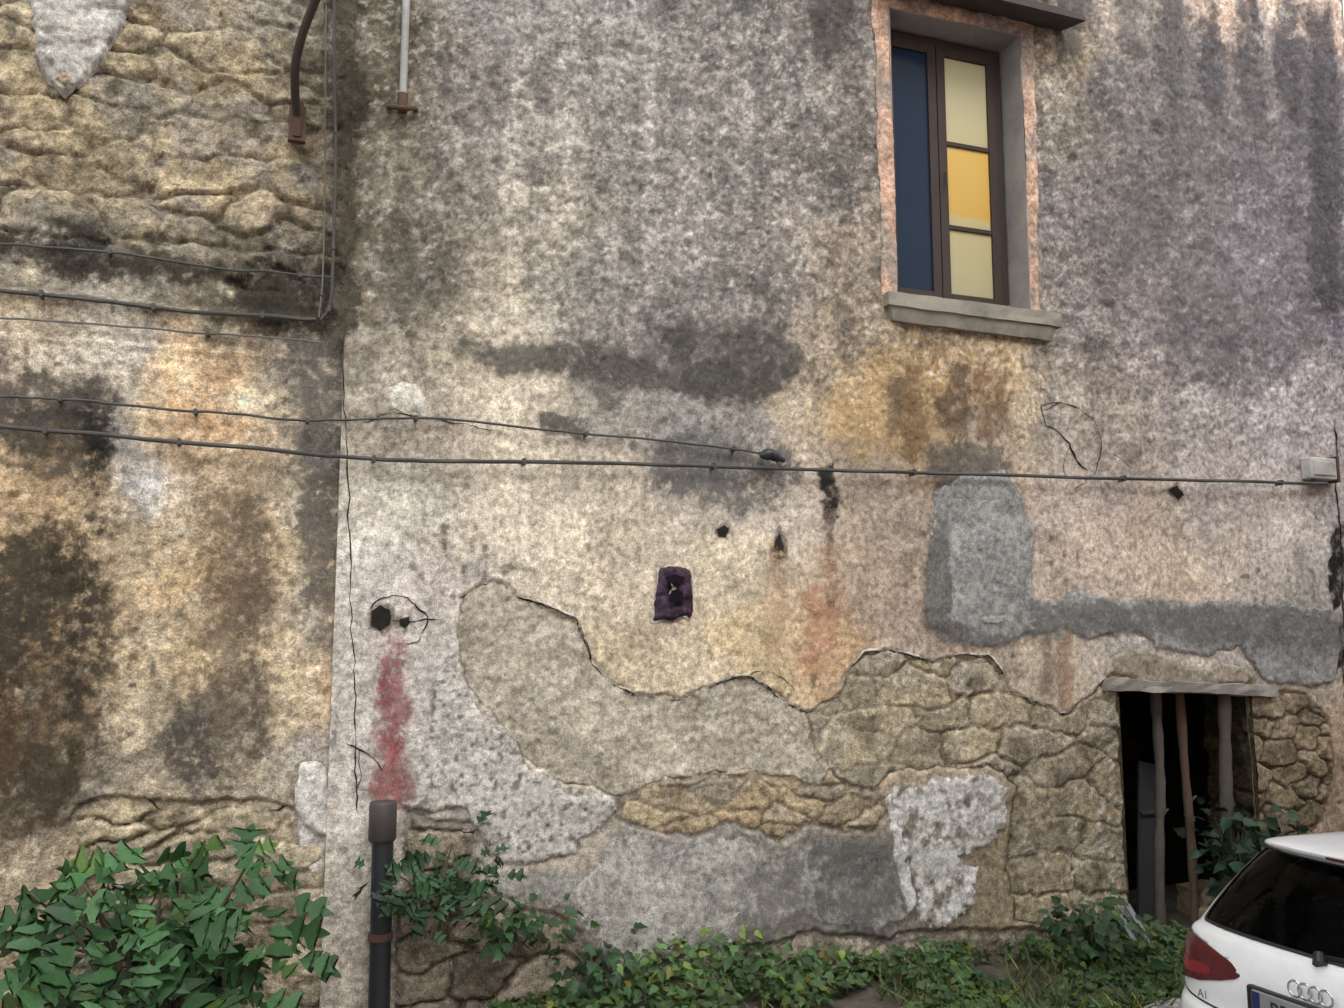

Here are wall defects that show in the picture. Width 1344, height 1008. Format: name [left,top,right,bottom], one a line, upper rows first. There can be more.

leakage [800,0,854,71]
leakage [1043,0,1093,62]
leakage [0,0,370,661]
leakage [453,314,805,408]
leakage [1087,0,1344,390]
leakage [0,359,121,833]
leakage [154,495,282,801]
corrosion [370,634,414,809]
flaking render [393,814,609,1008]
flaking render [457,575,1334,992]